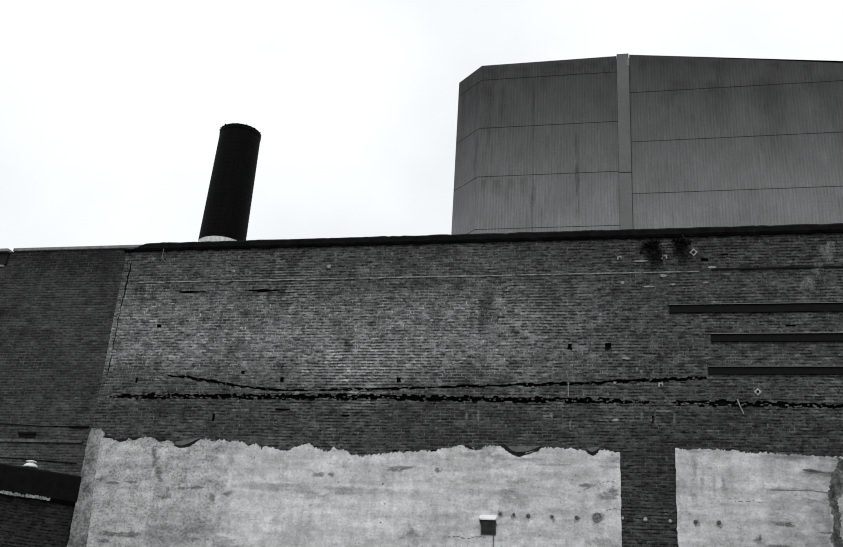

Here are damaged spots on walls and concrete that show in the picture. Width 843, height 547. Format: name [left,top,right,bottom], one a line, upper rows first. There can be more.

crack [107,260,843,409]
peeling [501,445,542,457]
crack [738,457,843,547]